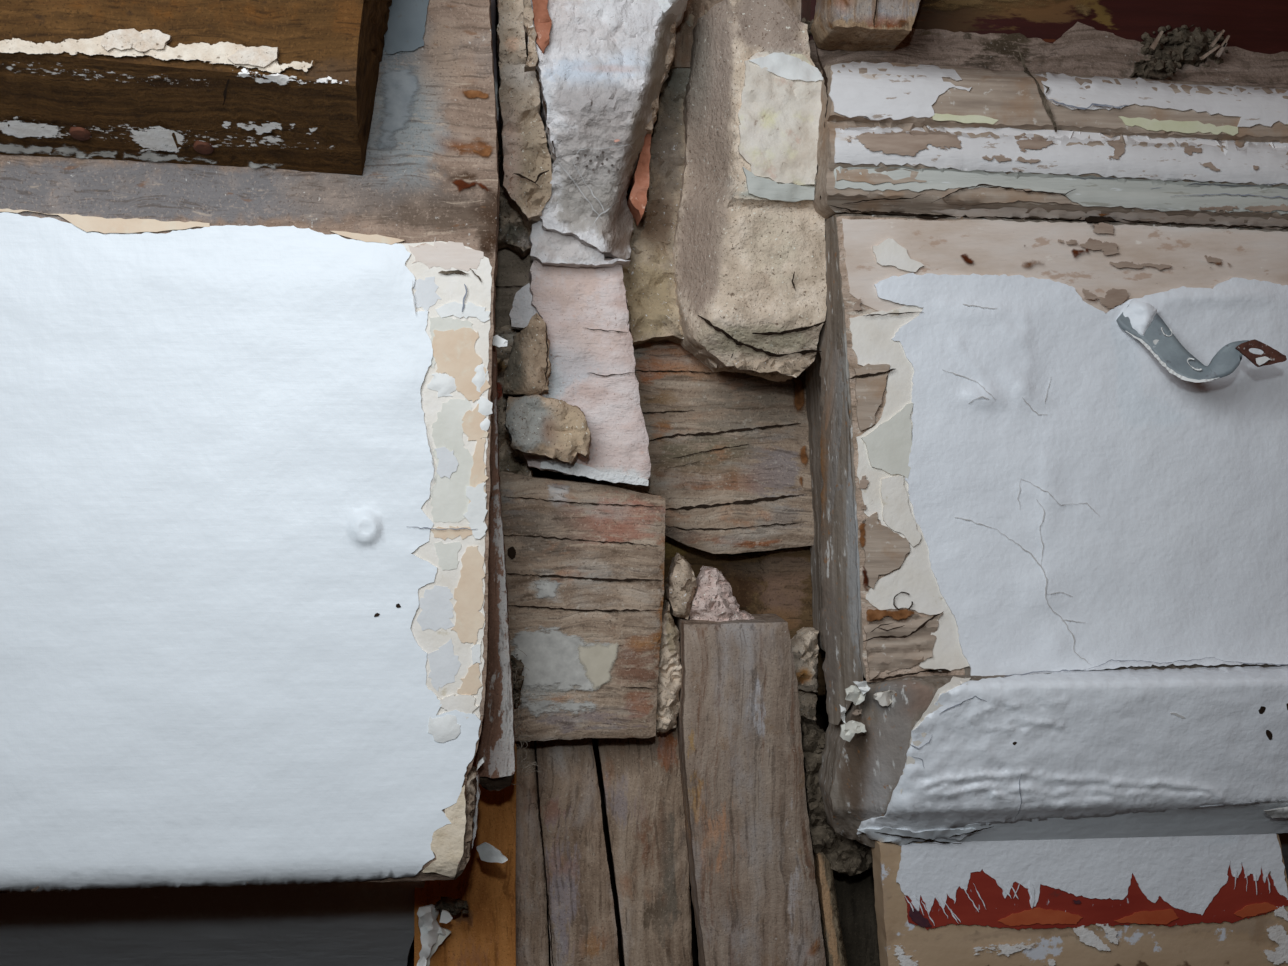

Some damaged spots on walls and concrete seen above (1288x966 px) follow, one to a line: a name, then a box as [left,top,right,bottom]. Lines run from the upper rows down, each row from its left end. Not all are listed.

peeling [0,28,349,86]
corrosion [463,90,488,99]
peeling [0,116,334,169]
corrosion [452,179,488,191]
peeling [738,52,823,203]
peeling [836,129,961,185]
peeling [0,208,210,234]
crack [942,369,1051,415]
peeling [330,231,508,743]
crack [955,479,1288,676]
spalling [839,614,942,742]
peeling [422,785,508,878]